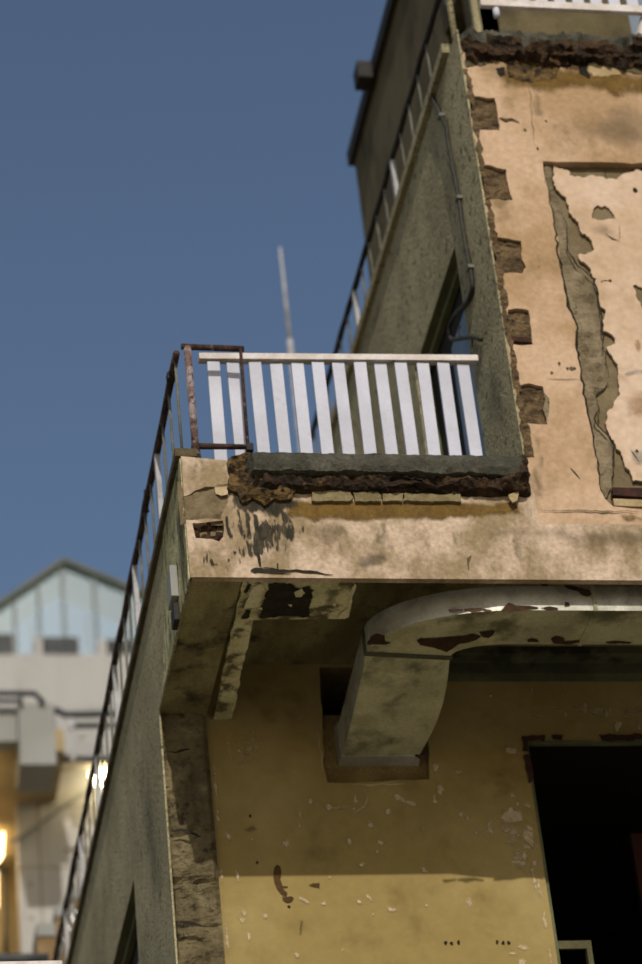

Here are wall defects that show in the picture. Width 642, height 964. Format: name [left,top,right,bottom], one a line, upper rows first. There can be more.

spalling [459,26,642,504]
spalling [177,482,231,541]
flaking render [311,490,461,504]
damp [203,494,314,619]
peeling [244,584,264,610]
peeling [332,584,356,619]